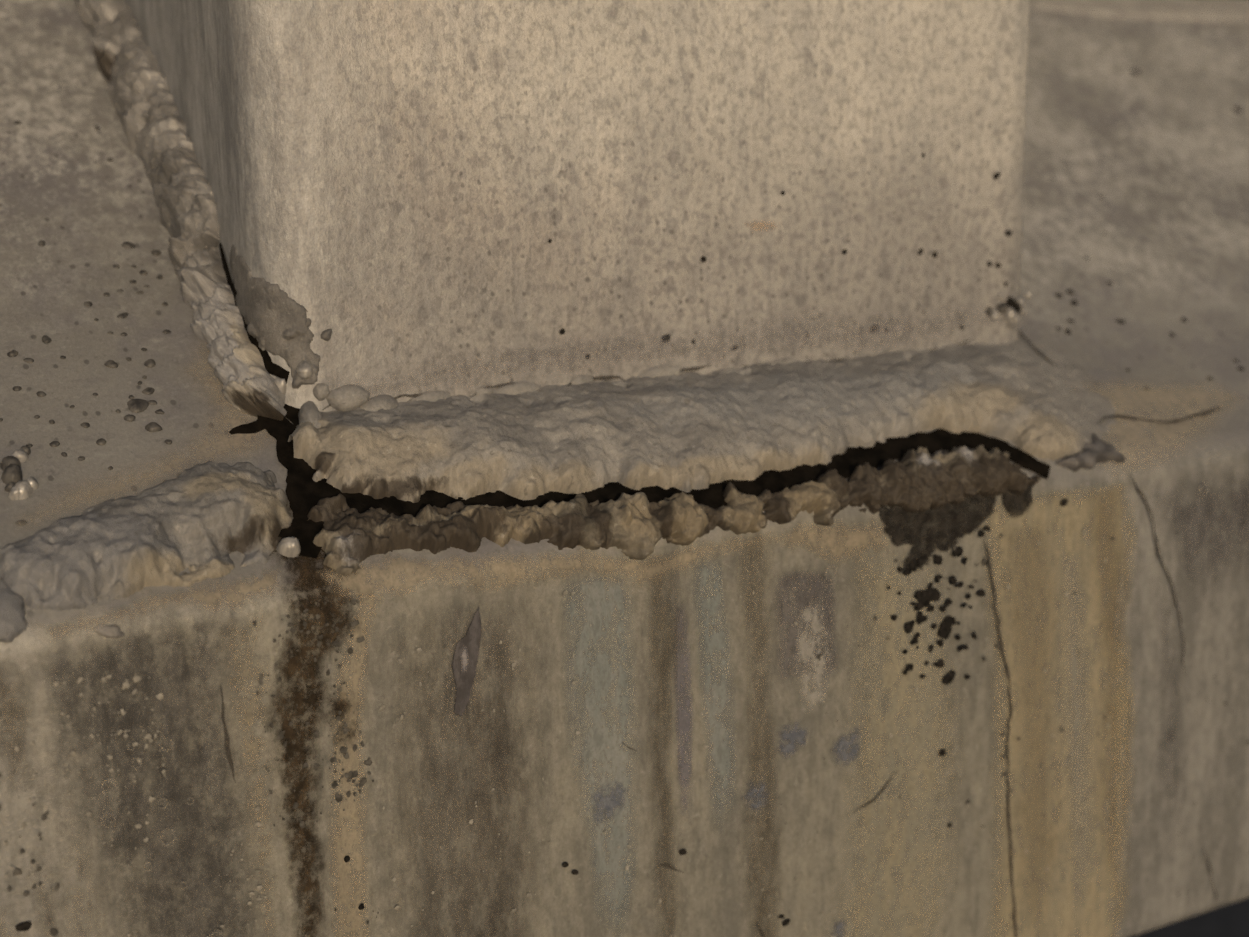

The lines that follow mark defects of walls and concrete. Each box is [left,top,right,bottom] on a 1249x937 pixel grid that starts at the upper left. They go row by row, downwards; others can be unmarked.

damp [57,637,236,937]
rust [272,549,374,937]
damp [331,548,731,937]
crack [219,242,1050,559]
damp [780,574,834,671]
damp [831,577,940,937]
peeling [880,485,1033,685]
crack [986,543,1018,937]
peeling [1056,433,1126,472]